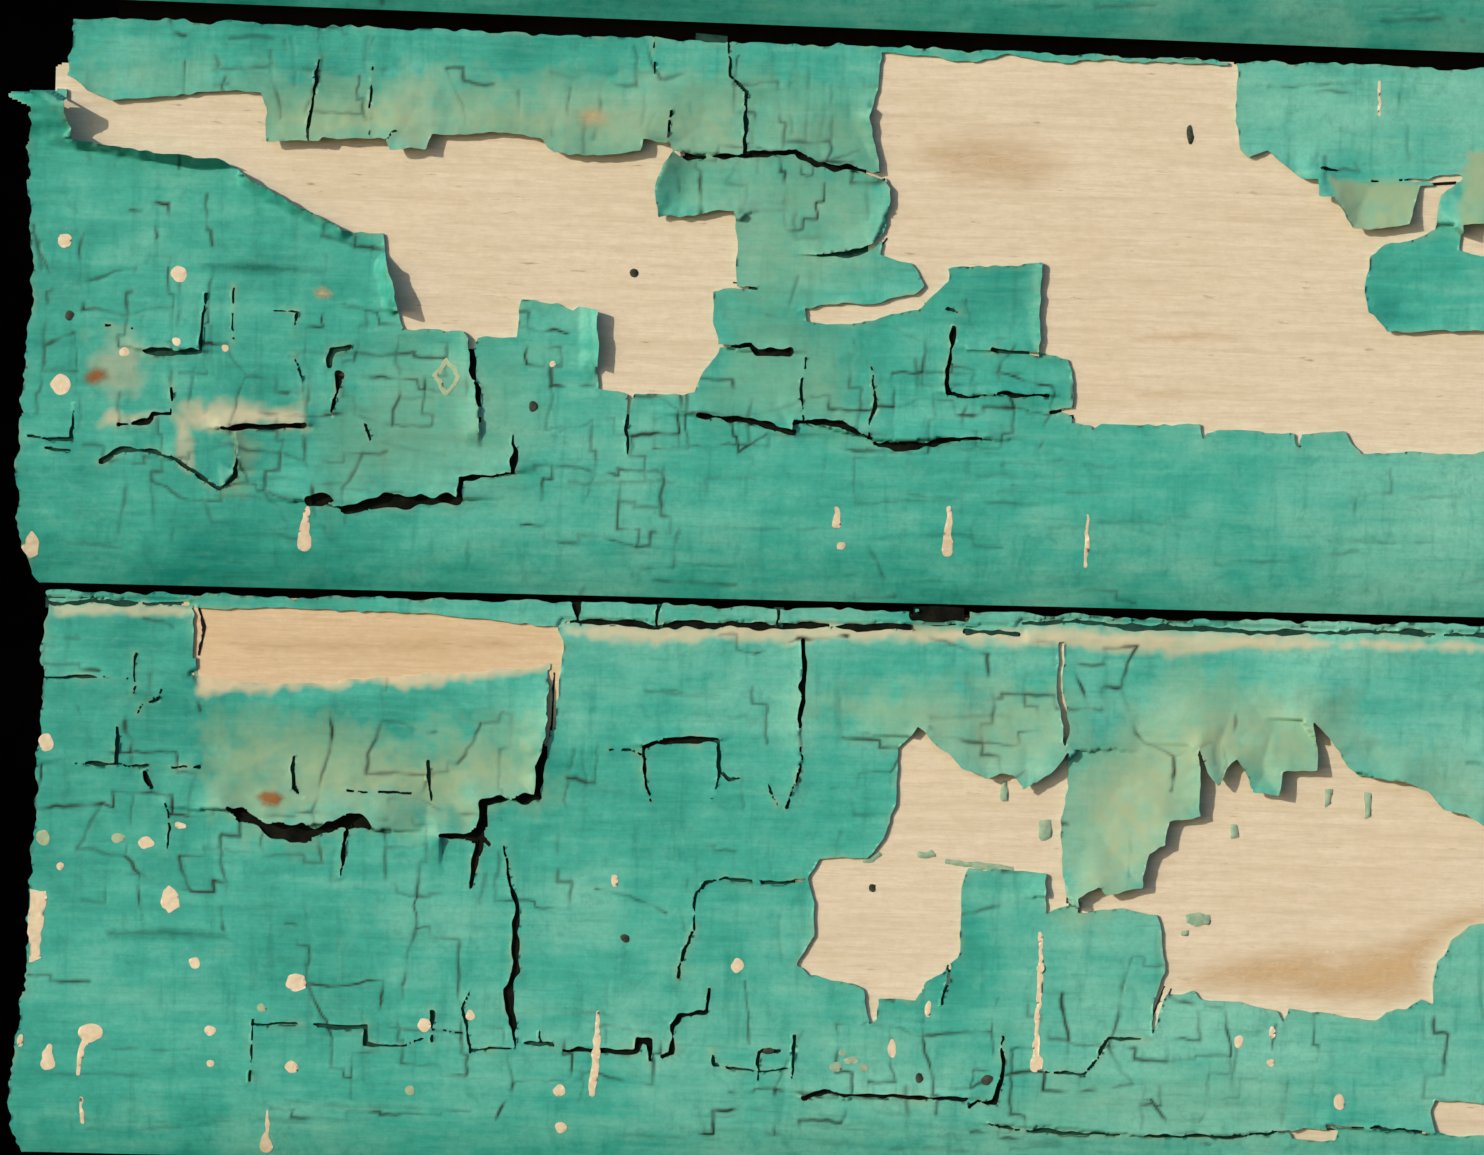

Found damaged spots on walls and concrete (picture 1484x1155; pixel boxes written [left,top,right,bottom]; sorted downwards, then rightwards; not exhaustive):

peeling [9,25,1484,506]
peeling [182,596,570,746]
peeling [209,749,365,834]
crack [227,672,795,1081]
peeling [795,642,1484,1033]
crack [941,965,951,1005]
crack [1045,986,1172,1076]
crack [711,1036,1277,1139]
crack [1326,1126,1422,1134]